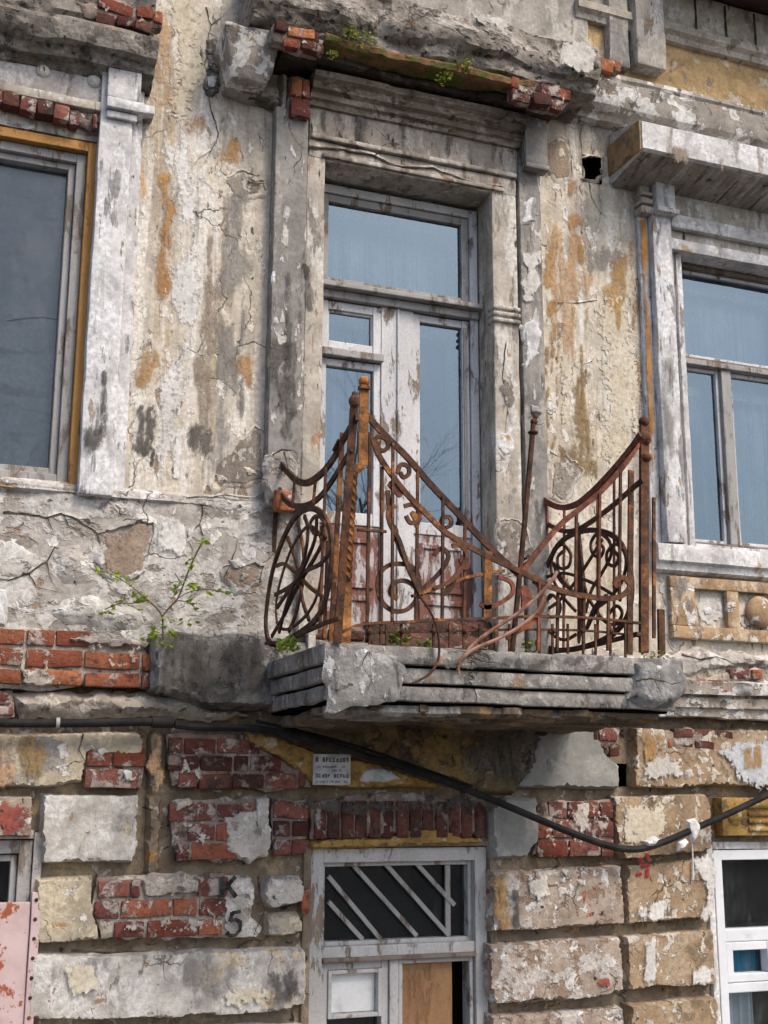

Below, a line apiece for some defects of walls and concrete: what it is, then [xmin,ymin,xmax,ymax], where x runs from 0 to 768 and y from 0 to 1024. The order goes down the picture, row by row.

crack [205,7,230,38]
crack [188,96,220,172]
peeling [547,134,605,185]
water stain [132,0,254,479]
water stain [545,246,643,482]
water stain [83,370,108,452]
peeling [207,423,298,515]
crack [3,510,132,595]
spalling [656,573,768,682]
flaking render [0,540,311,941]
flaking render [594,727,626,786]
flaking render [644,728,733,781]